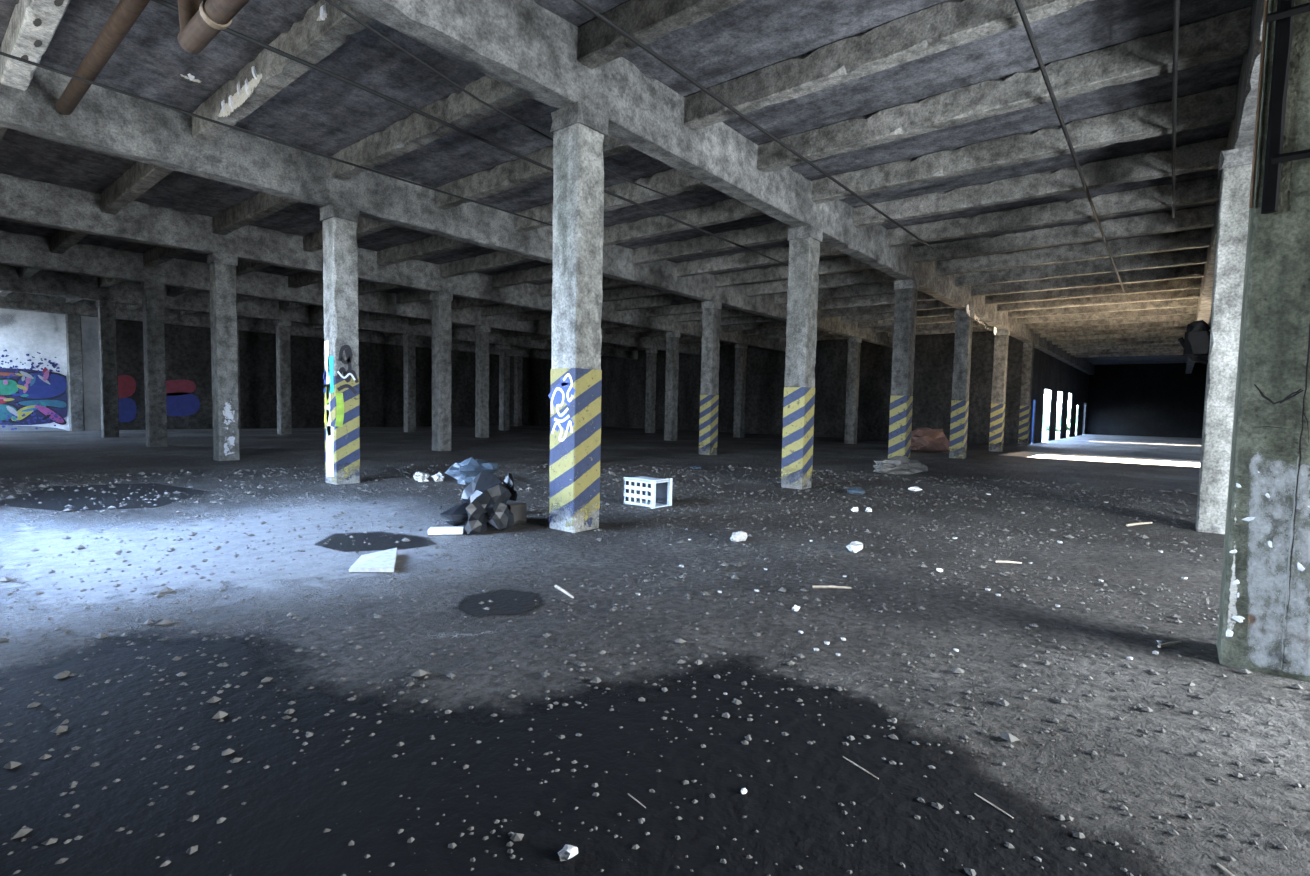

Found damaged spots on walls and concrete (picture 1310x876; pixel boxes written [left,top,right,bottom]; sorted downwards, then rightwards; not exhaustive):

peeling [1226,453,1310,676]